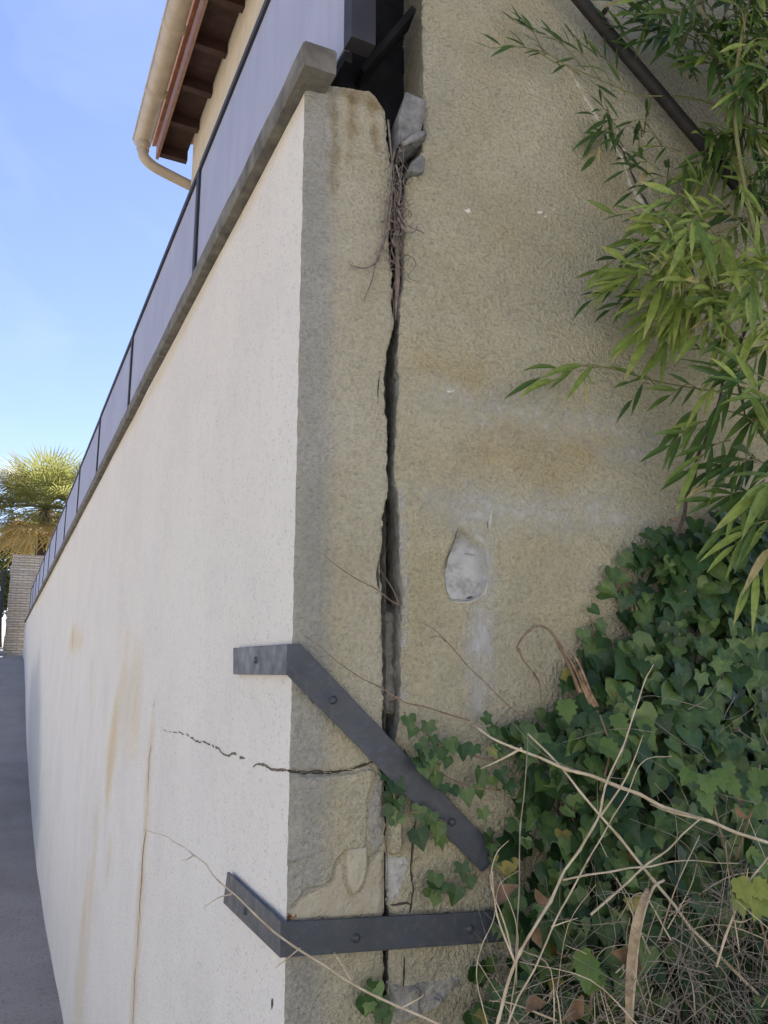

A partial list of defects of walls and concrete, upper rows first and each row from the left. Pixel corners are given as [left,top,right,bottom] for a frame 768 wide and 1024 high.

crack [392,164,406,203]
spalling [445,503,495,604]
crack [376,560,395,719]
crack [147,730,372,793]
crack [391,822,416,912]